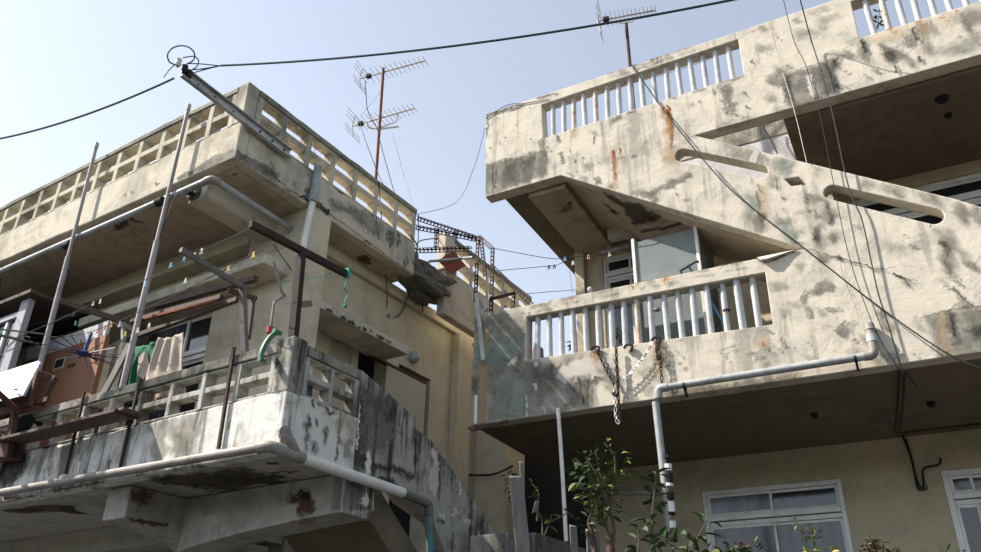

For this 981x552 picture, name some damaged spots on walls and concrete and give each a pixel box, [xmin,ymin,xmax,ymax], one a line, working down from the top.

water stain [827,22,934,78]
water stain [959,9,981,39]
rust [662,105,673,148]
peeling [485,135,691,225]
water stain [470,295,593,424]
water stain [305,399,414,485]